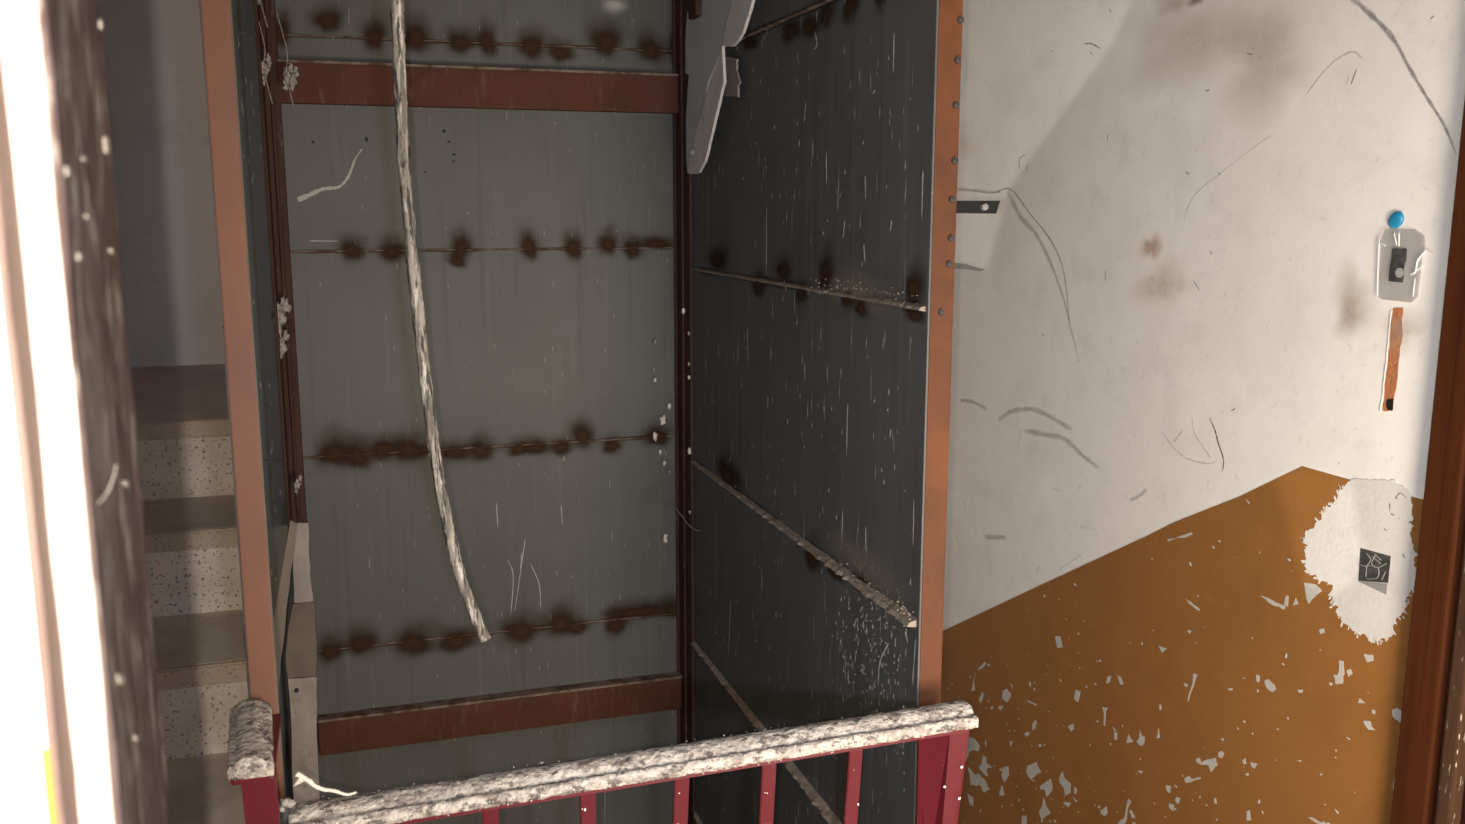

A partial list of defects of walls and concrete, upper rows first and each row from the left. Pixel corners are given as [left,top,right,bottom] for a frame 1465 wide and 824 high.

rust [276,12,672,60]
rust [523,237,581,256]
rust [601,235,670,258]
crack [955,263,984,271]
rust [322,425,666,465]
peeling [1262,478,1418,686]
rust [321,603,676,659]
peeling [1228,674,1276,692]
peeling [966,619,1136,824]
peeling [1096,707,1160,775]
peeling [1358,692,1402,730]
peeling [1154,720,1253,821]